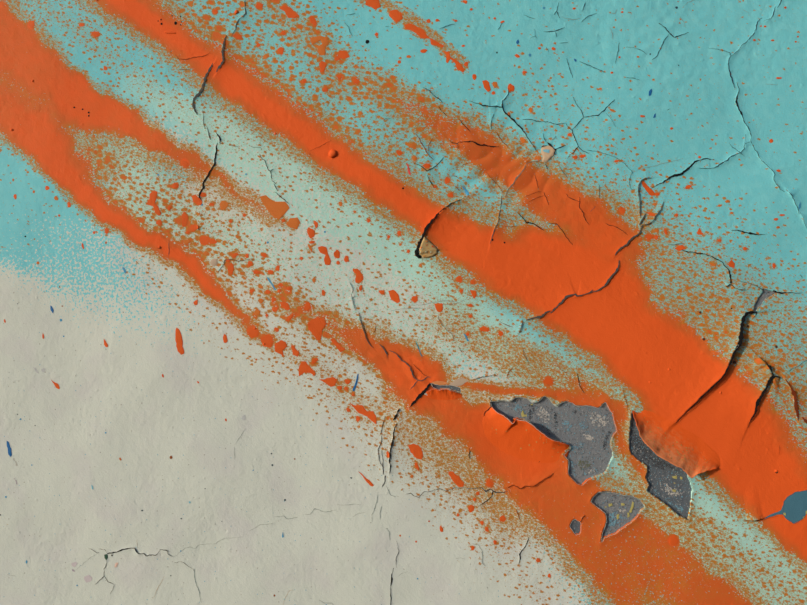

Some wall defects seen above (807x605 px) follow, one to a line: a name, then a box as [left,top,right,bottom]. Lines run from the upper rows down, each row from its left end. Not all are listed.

crack [175,1,288,230]
crack [415,0,807,380]
crack [90,283,554,605]
peeling [482,396,617,485]
peeling [570,519,581,535]
peeling [591,491,645,542]
peeling [629,410,720,520]
crack [676,311,757,423]
crack [748,357,807,427]
peeling [766,490,807,524]